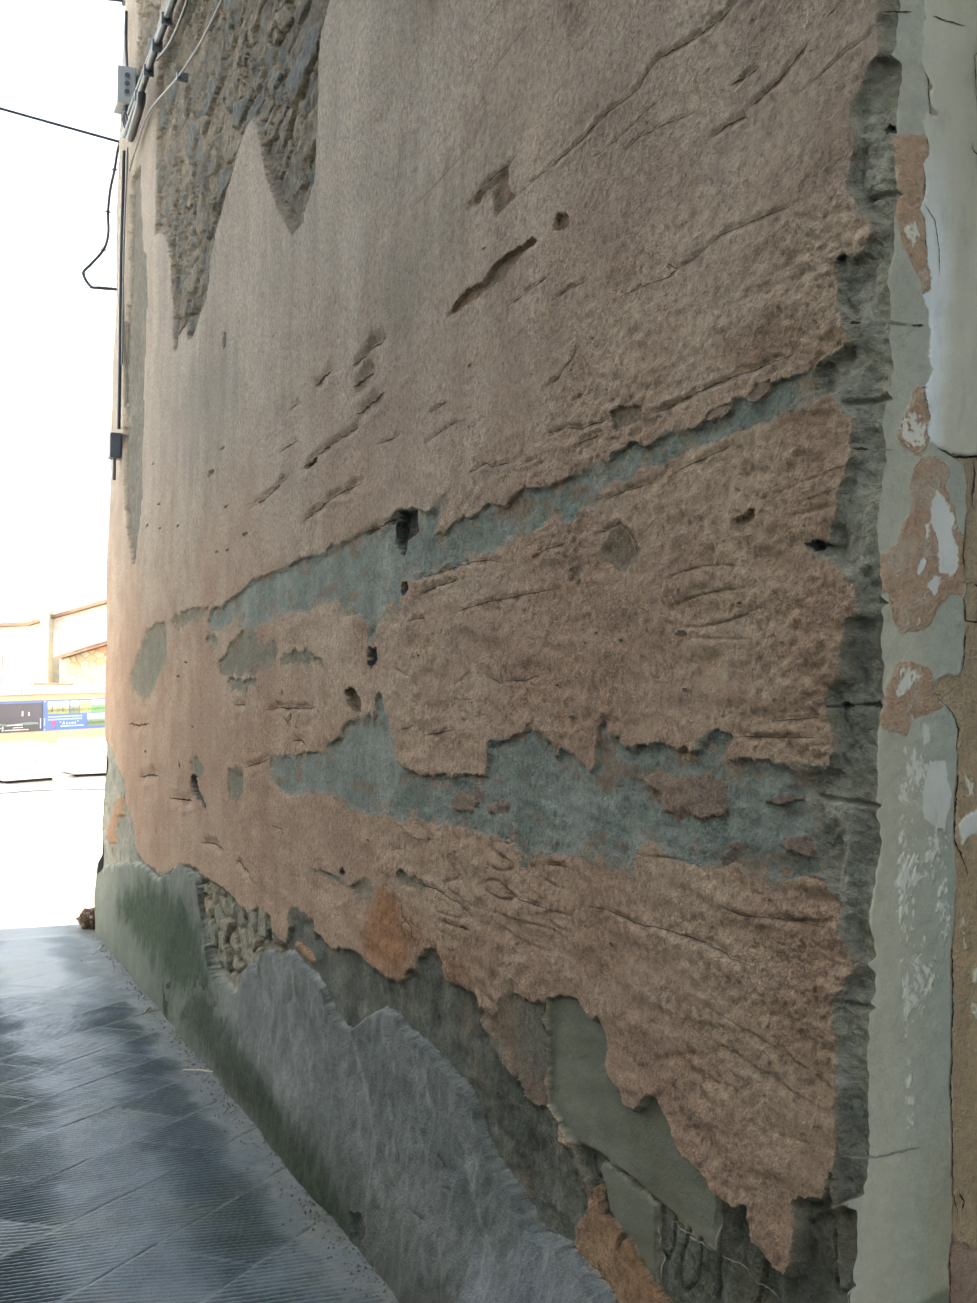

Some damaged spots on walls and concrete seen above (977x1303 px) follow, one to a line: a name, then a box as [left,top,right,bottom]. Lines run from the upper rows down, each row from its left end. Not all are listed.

crack [471,7,732,199]
crack [798,35,868,92]
flaking render [123,0,330,564]
crack [503,275,586,308]
crack [622,192,814,296]
flaking render [207,0,977,736]
flaking render [130,622,167,701]
flaking render [170,605,208,631]
peeling [895,724,953,947]
peeling [958,810,977,846]
flaking render [183,691,883,1303]
flaking render [947,1233,977,1303]